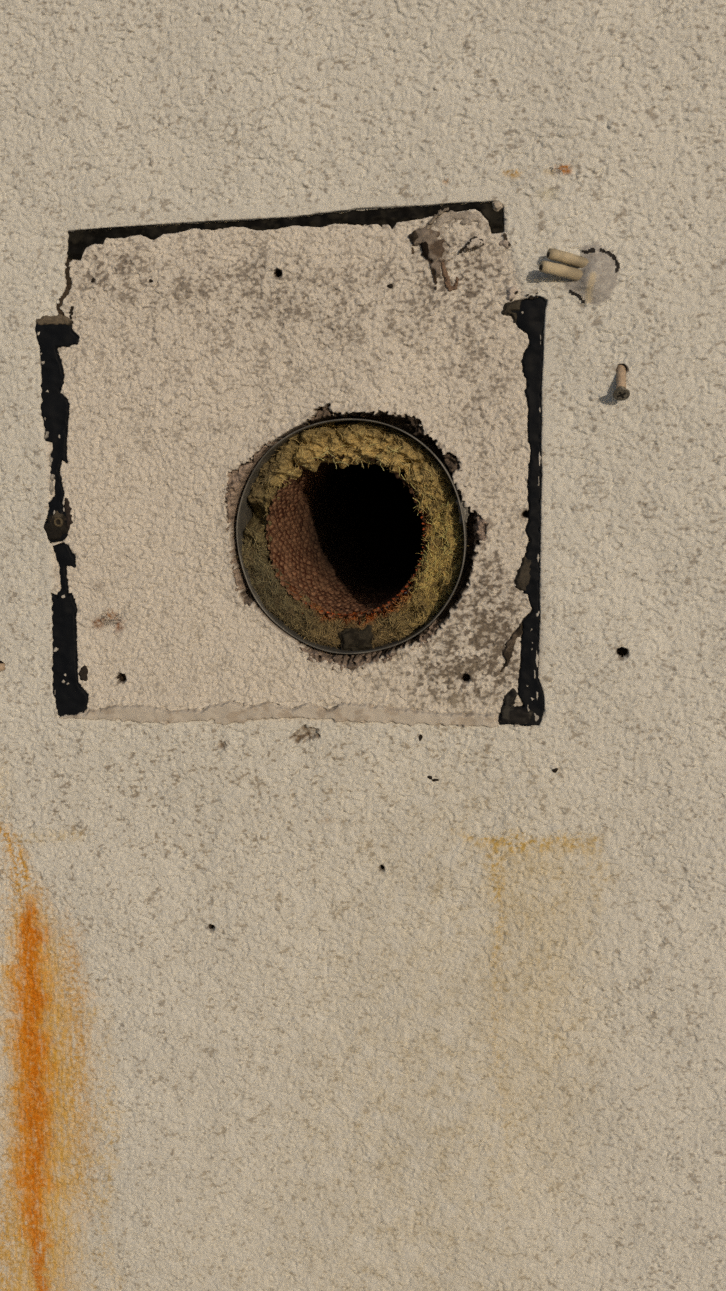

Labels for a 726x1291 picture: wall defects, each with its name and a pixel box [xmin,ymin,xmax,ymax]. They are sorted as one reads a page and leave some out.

peeling [408,207,511,292]
rust [0,743,133,1291]